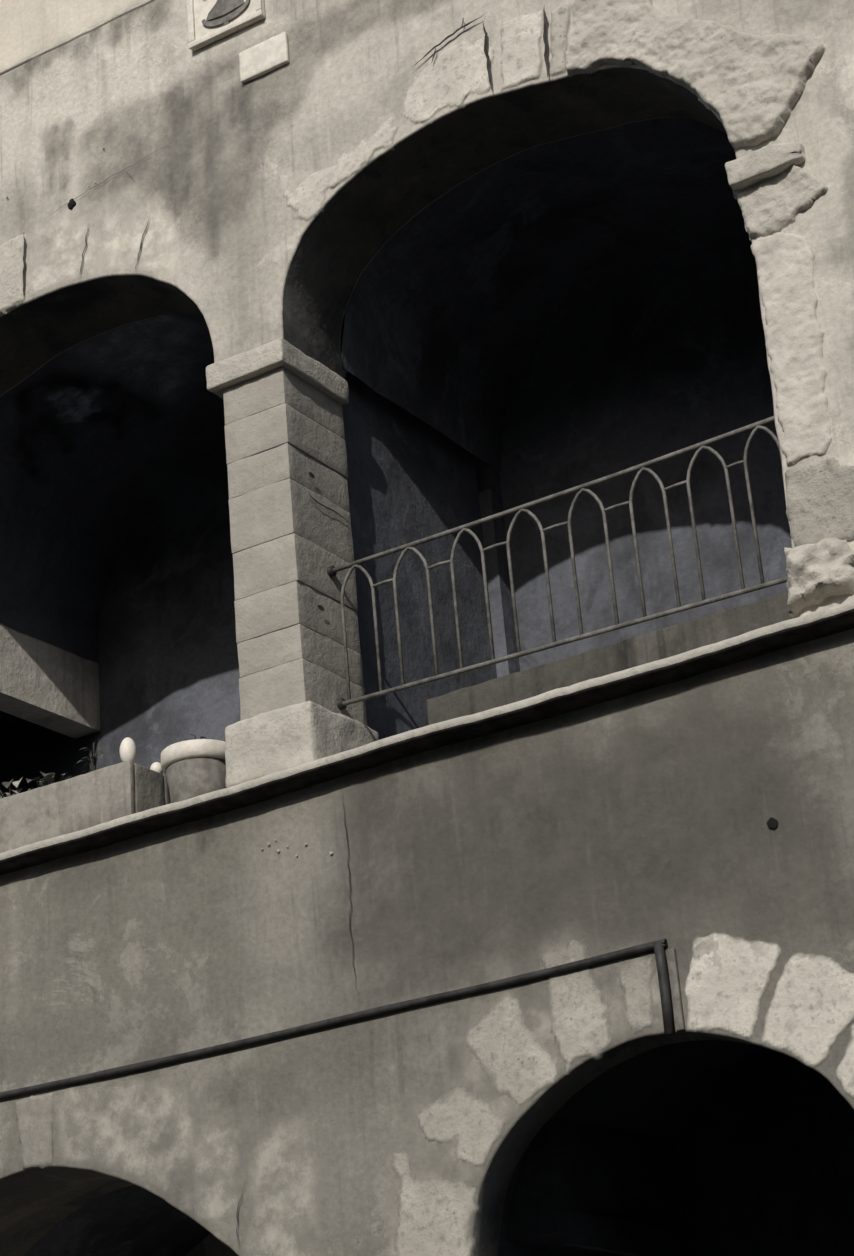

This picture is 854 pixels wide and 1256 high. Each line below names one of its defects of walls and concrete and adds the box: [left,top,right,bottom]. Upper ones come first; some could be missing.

crack [413,15,492,90]
crack [542,9,550,78]